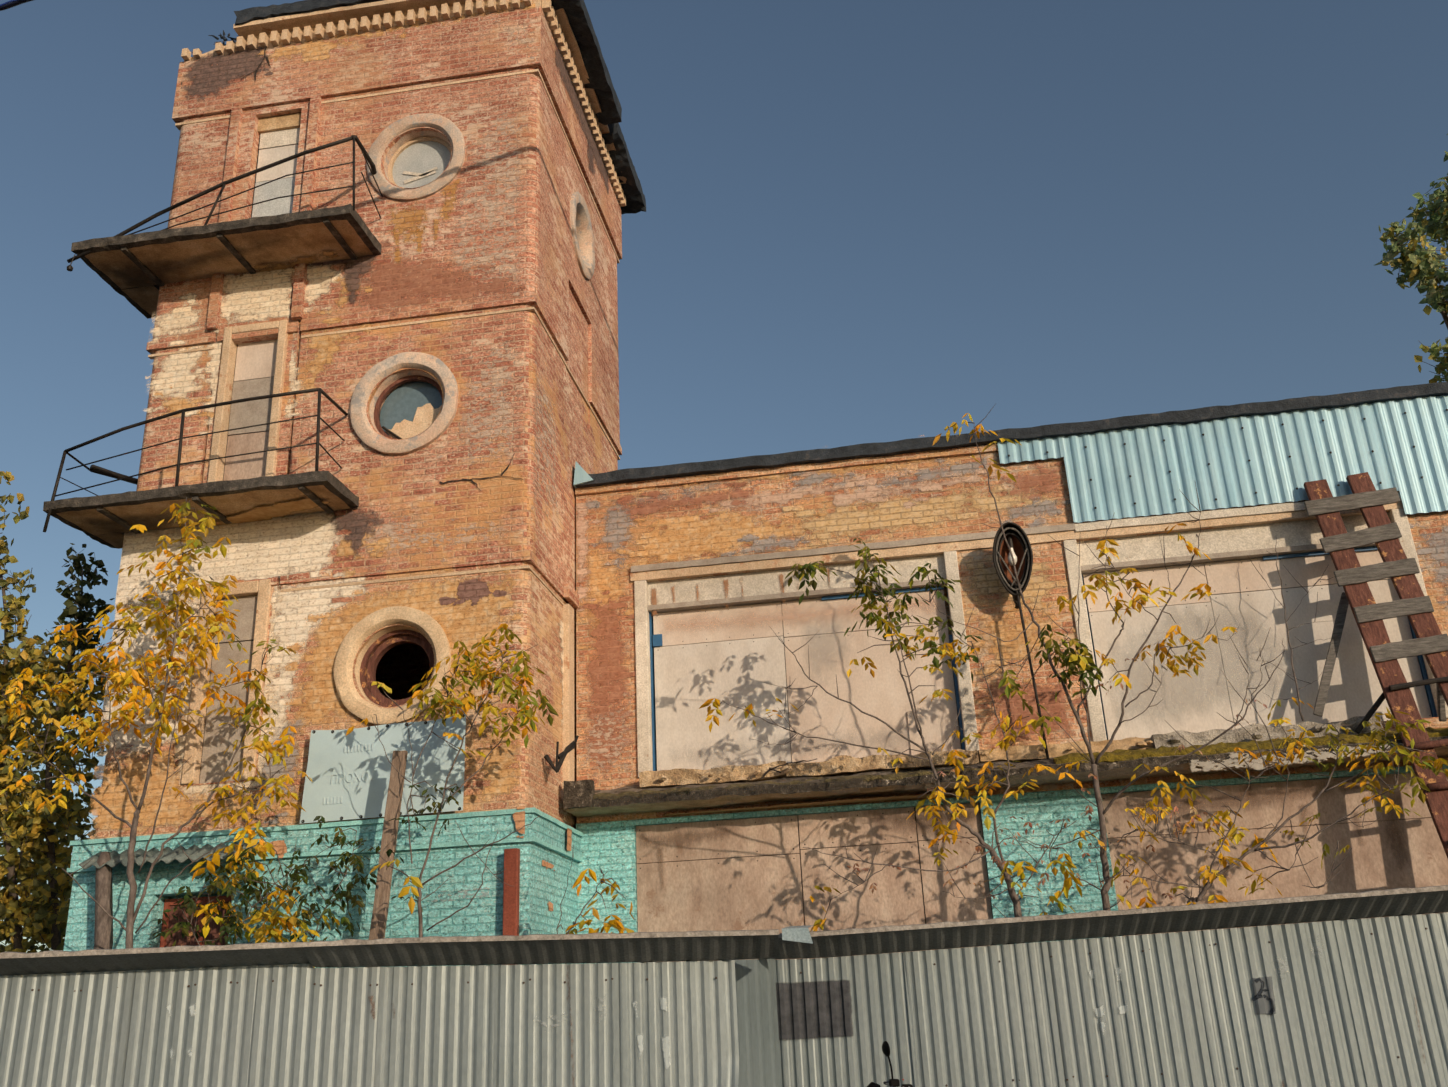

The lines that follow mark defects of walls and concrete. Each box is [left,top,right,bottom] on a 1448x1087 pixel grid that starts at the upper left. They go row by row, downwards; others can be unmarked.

peeling [144,242,526,436]
peeling [91,498,525,858]
damp [328,508,504,561]
peeling [559,457,1071,784]
spalling [639,557,1383,788]